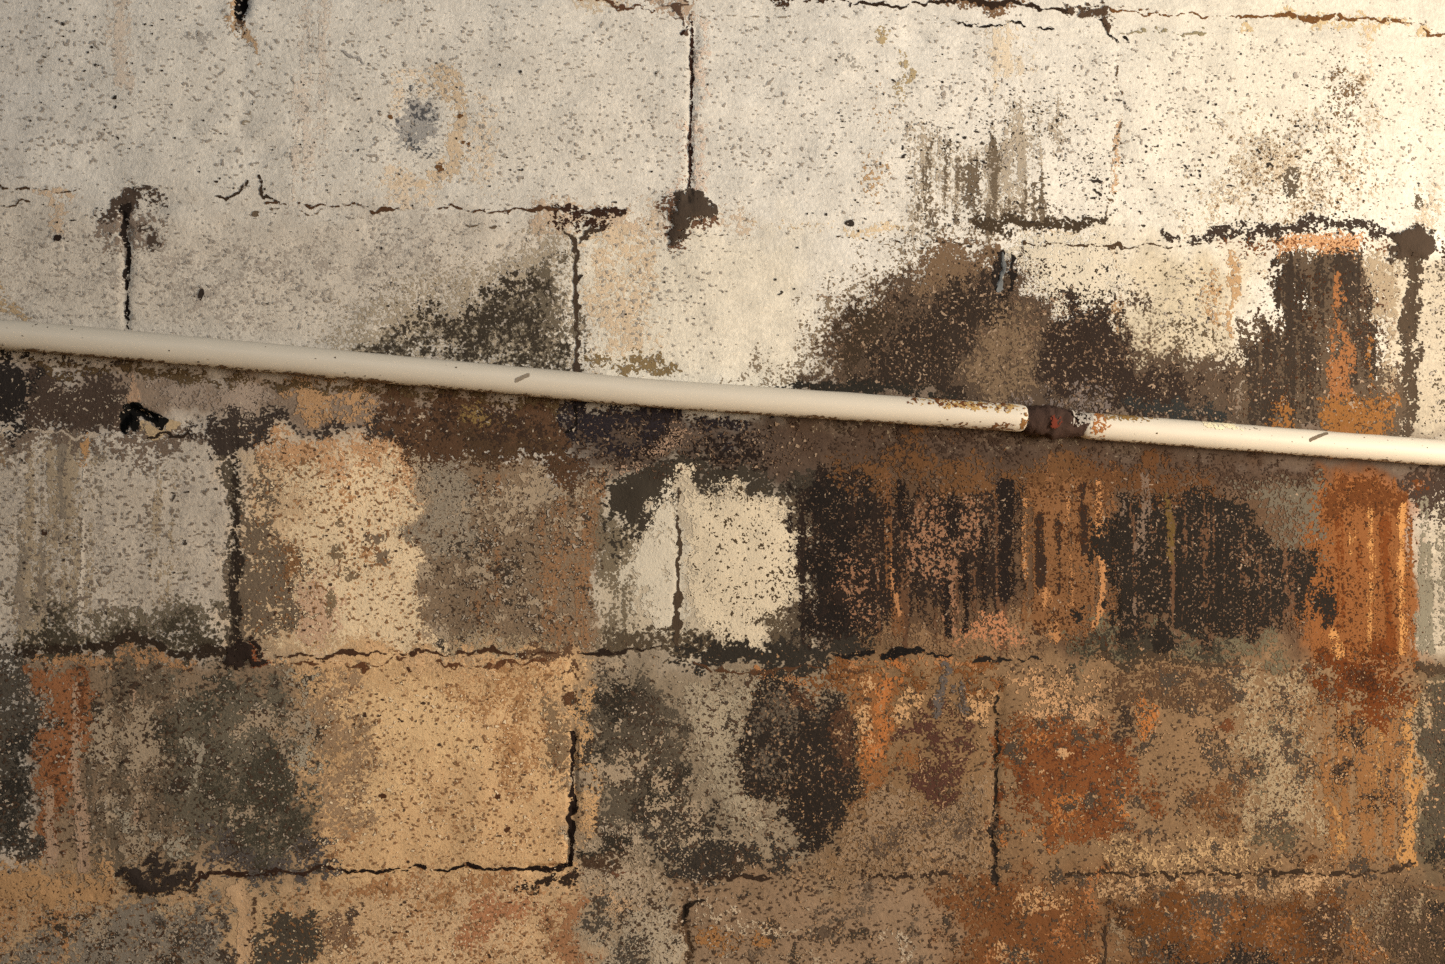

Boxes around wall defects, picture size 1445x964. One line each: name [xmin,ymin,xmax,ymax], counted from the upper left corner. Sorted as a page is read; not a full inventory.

crack [597,0,1445,188]
crack [119,202,132,329]
crack [216,174,610,433]
damp [286,201,683,378]
corrosion [1316,271,1402,436]
corrosion [0,641,197,964]
damp [0,349,396,964]
corrosion [29,358,702,842]
crack [189,731,645,889]
crack [276,487,1041,886]
damp [423,400,1445,964]
corrosion [924,458,1429,964]